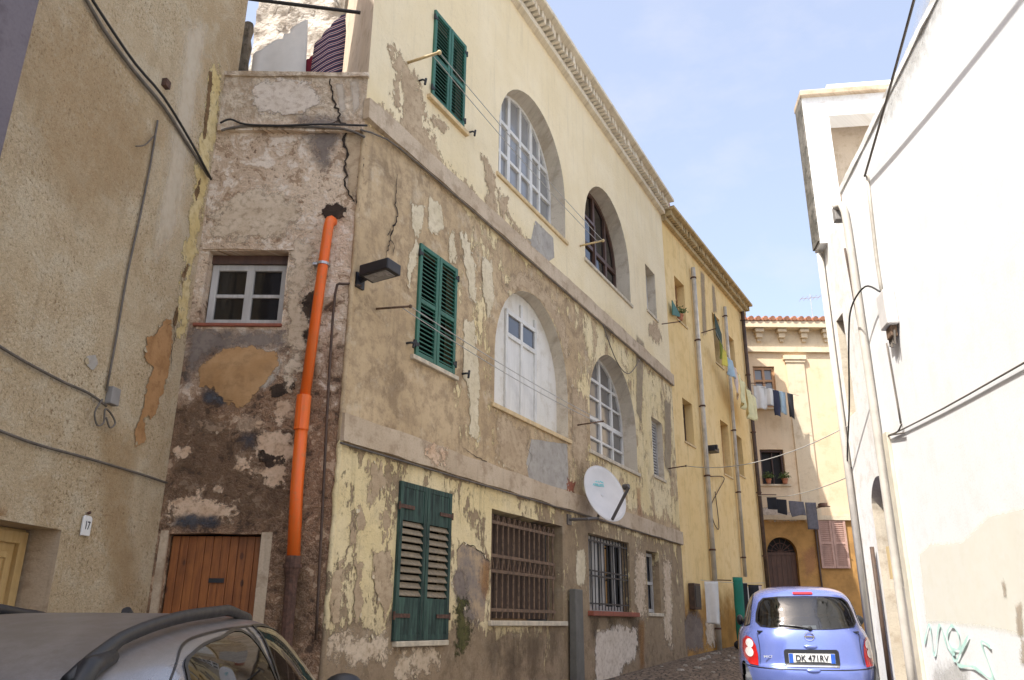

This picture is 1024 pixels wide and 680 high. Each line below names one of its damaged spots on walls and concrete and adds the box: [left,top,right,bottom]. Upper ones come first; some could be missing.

flaking render [322,133,362,222]
crack [329,79,364,209]
crack [386,174,398,256]
peeling [378,43,536,245]
flaking render [134,63,321,490]
water stain [187,327,286,371]
spalling [164,482,240,527]
peeling [326,458,441,680]
spalling [451,542,490,622]
flaking render [595,546,648,680]
flaking render [662,556,673,651]